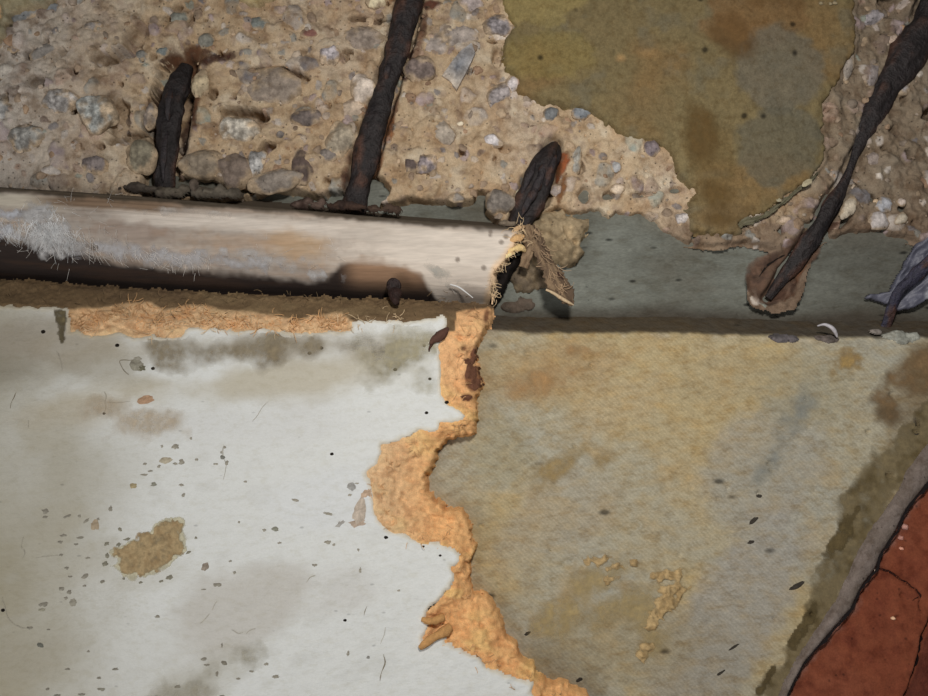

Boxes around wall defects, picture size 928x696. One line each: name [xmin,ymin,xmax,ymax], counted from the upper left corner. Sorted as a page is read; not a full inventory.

corrosion [160,45,234,79]
corrosion [408,0,440,59]
corrosion [181,95,199,158]
spalling [0,0,396,203]
corrosion [374,95,399,181]
spalling [372,0,928,261]
corrosion [556,153,570,203]
spalling [747,262,811,314]
corrosion [746,222,839,305]
peeling [63,514,99,530]
peeling [102,517,197,584]
leakage [755,392,928,696]